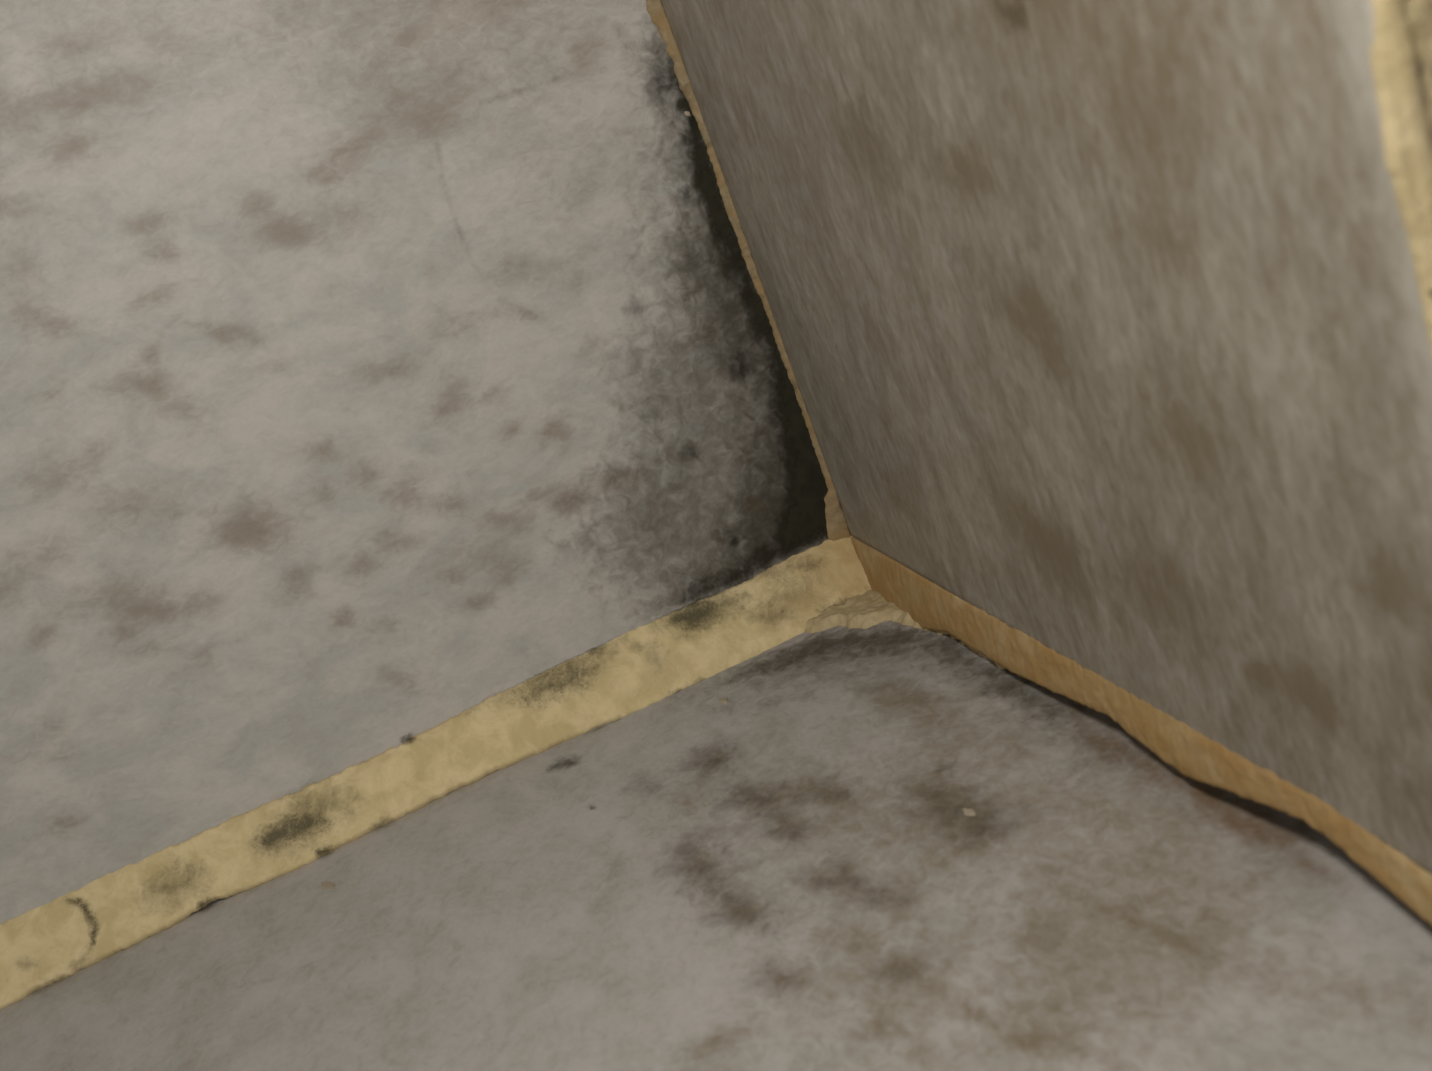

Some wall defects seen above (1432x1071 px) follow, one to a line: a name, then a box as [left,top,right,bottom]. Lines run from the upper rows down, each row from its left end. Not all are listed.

water stain [641,72,829,623]
water stain [262,816,317,845]